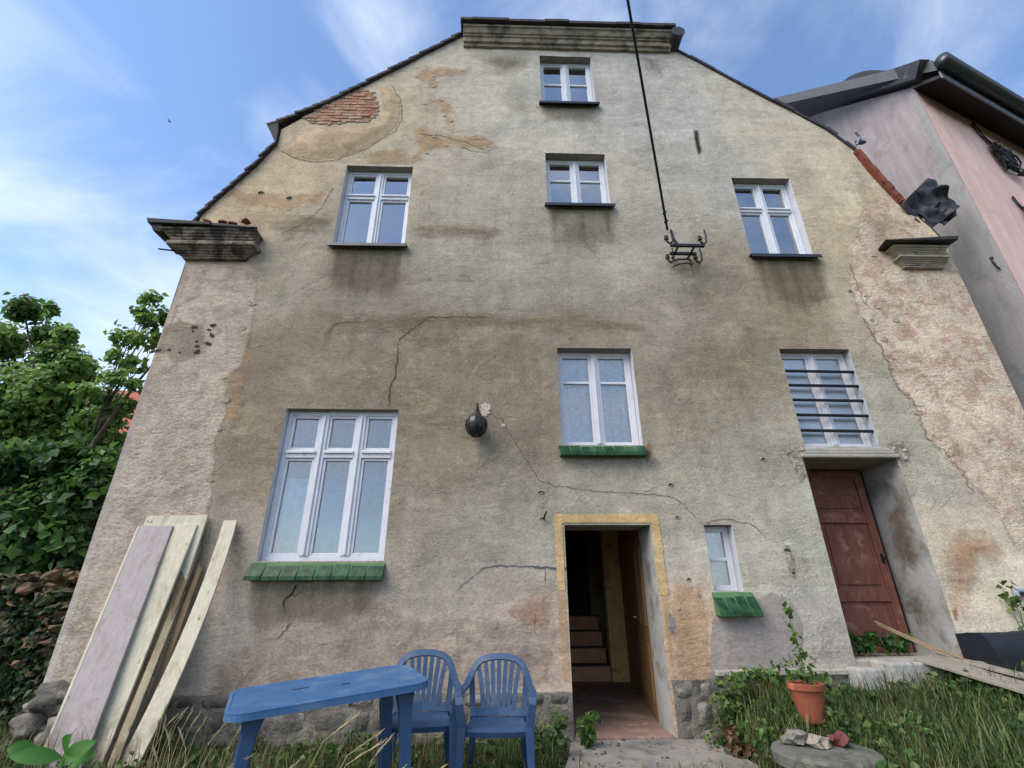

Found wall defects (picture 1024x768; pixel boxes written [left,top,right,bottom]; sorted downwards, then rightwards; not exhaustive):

flaking render [302,87,380,125]
peeling [415,68,467,123]
peeling [412,129,491,163]
crack [388,316,481,407]
crack [849,264,974,494]
flaking render [848,196,1024,550]
flaking render [478,403,491,417]
flaking render [50,261,257,687]
crack [489,411,758,529]
crack [457,564,567,590]
crack [277,586,304,640]